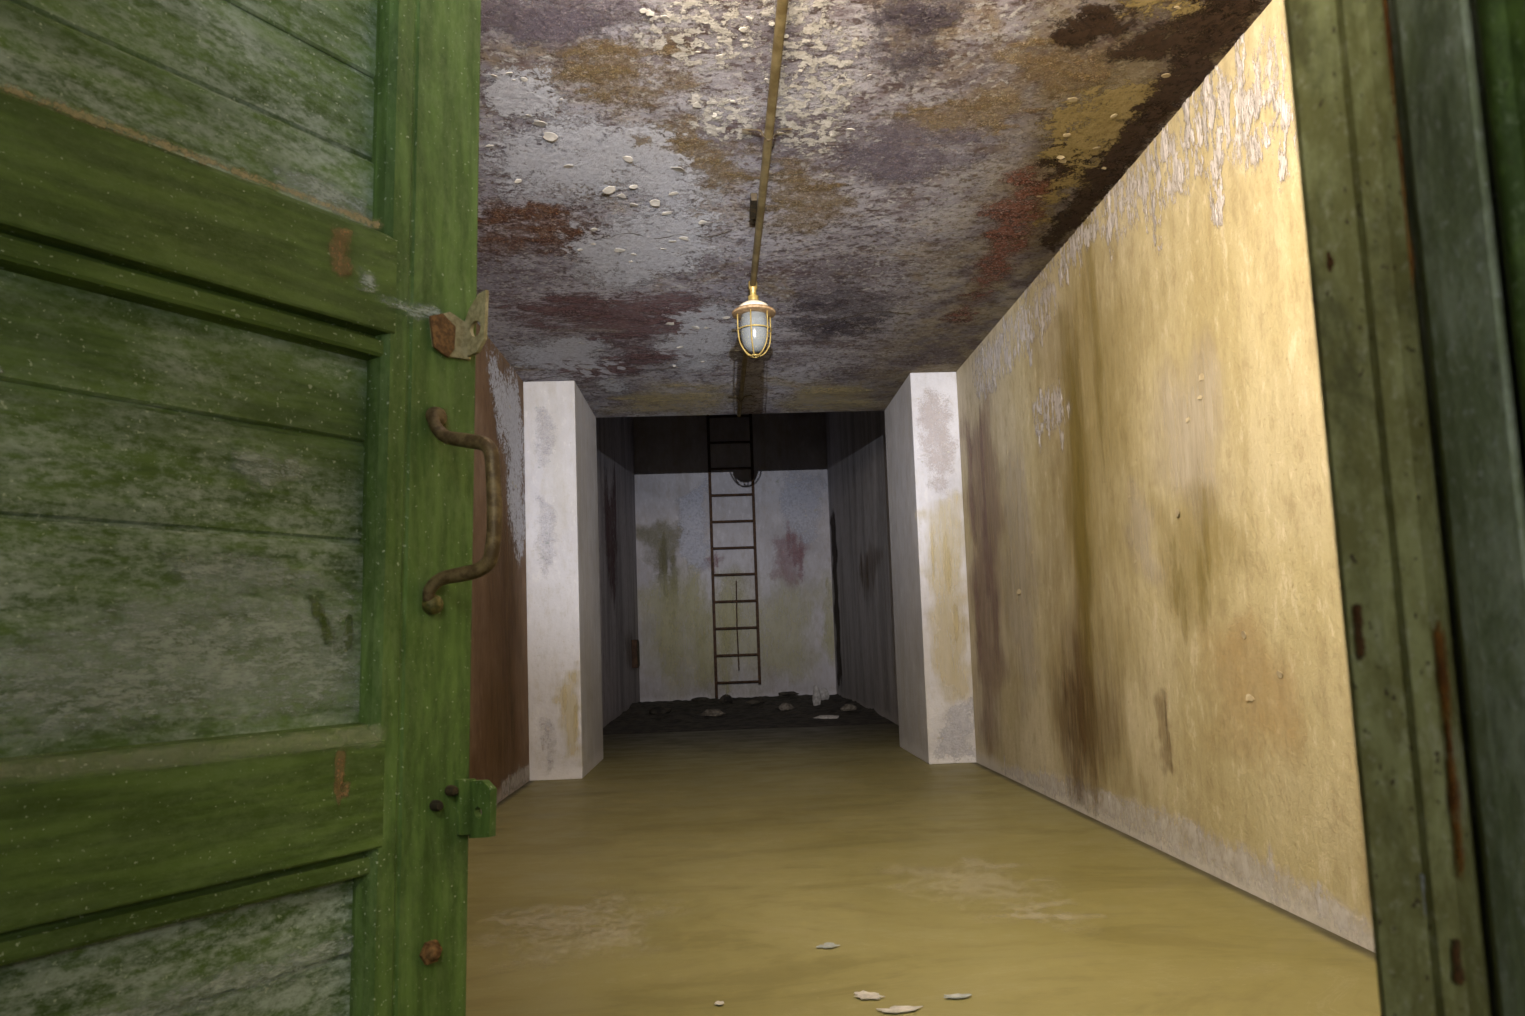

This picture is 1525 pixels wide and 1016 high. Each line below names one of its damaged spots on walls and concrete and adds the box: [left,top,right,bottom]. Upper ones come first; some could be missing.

corrosion [477,194,609,266]
leakage [972,0,1297,401]
corrosion [478,289,732,382]
leakage [1032,381,1070,451]
leakage [637,523,801,692]
leakage [1004,758,1355,929]